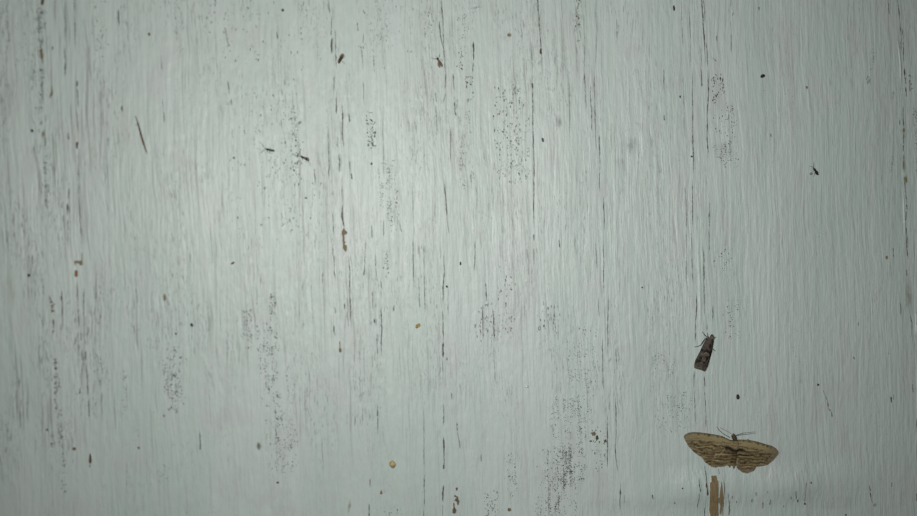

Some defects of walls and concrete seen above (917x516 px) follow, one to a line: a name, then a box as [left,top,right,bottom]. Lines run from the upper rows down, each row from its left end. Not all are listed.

peeling [709,475,730,516]